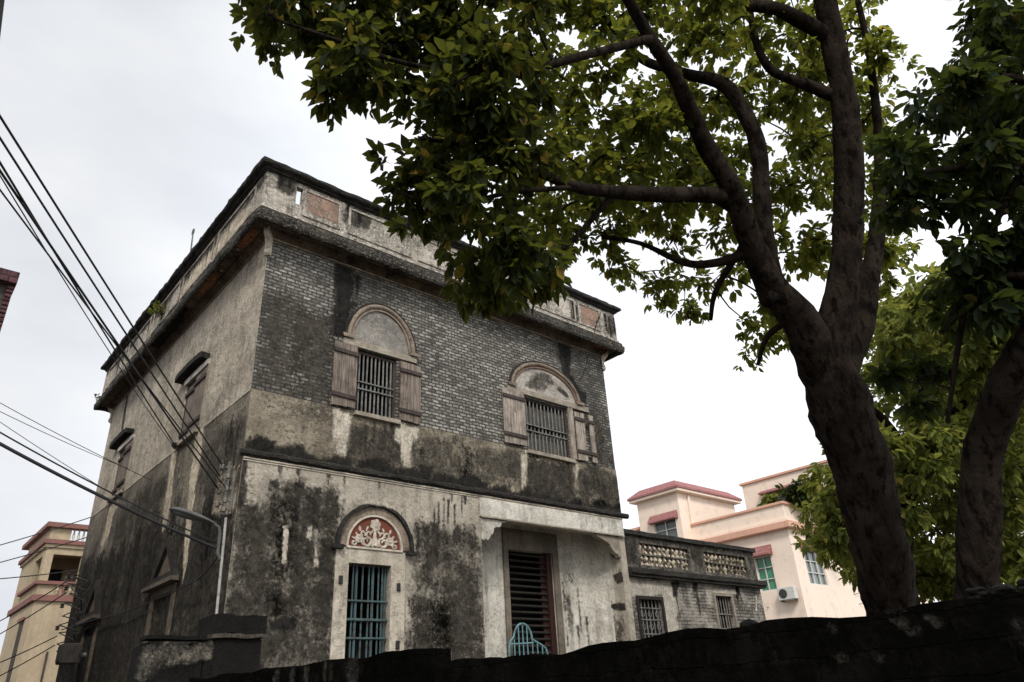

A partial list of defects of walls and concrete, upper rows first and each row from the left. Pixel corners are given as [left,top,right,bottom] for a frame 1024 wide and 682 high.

leakage [55,263,621,682]